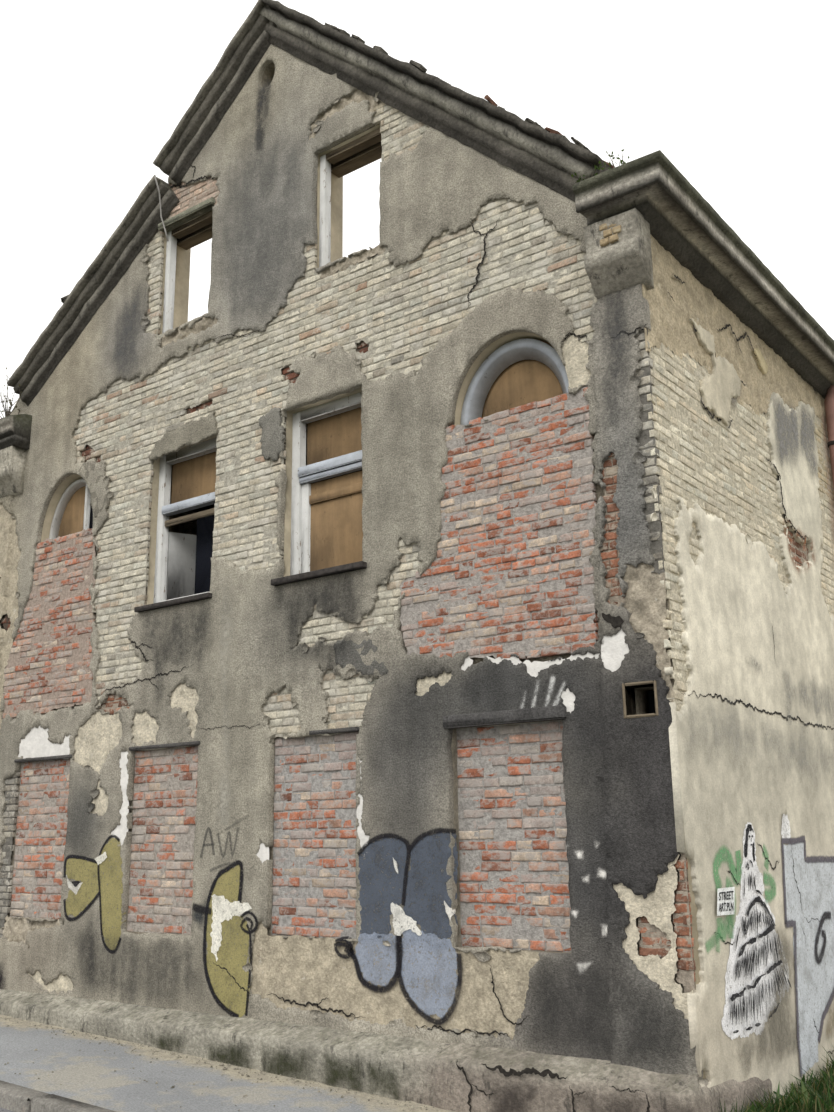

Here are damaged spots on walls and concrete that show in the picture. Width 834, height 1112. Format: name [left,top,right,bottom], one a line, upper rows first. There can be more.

damp [256,83,270,149]
crack [467,219,500,307]
spalling [599,223,621,247]
spalling [486,234,834,711]
crack [767,442,808,540]
spalling [0,199,598,948]
crack [684,691,834,730]
spalling [613,853,696,1019]
crack [416,968,650,1112]